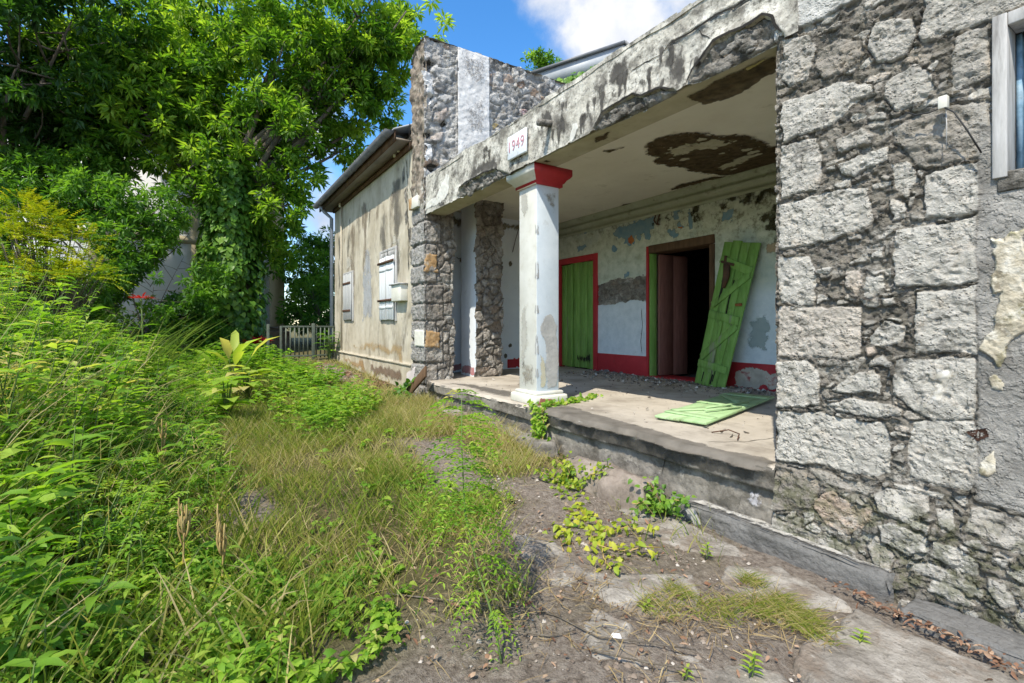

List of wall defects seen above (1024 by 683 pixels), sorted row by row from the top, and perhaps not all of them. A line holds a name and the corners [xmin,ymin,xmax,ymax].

spalling [596,18,784,130]
spalling [459,171,509,197]
peeling [666,138,763,190]
damp [338,179,400,286]
peeling [612,216,655,252]
flaking render [979,229,1024,390]
damp [364,343,402,380]
flaking render [534,305,559,405]
flaking render [979,451,996,477]